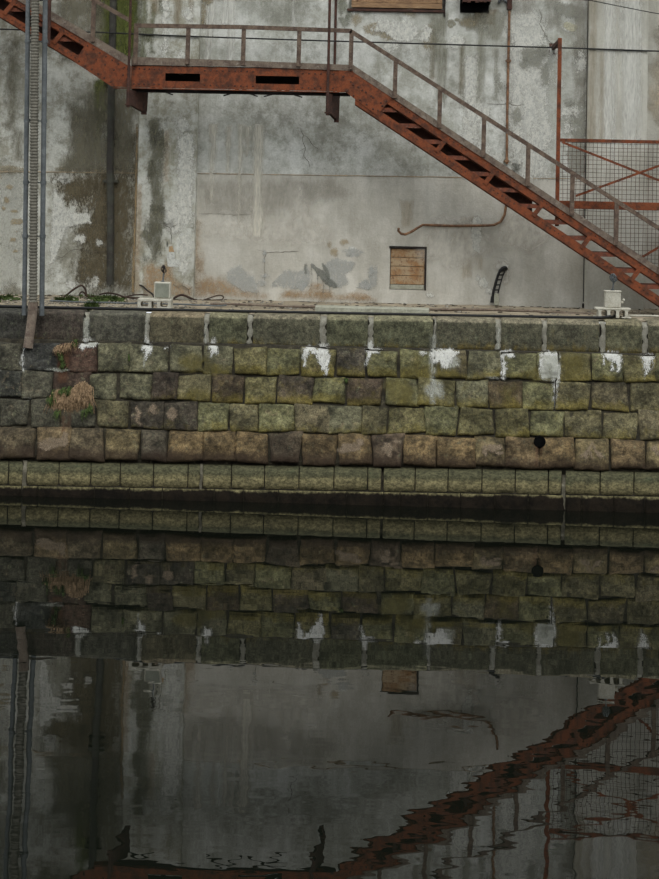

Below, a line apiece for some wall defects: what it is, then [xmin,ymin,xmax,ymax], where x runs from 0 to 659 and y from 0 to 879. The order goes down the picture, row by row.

damp [51,79,167,295]
spalling [272,246,378,293]
efflorescence [303,343,330,376]
damp [364,341,383,365]
damp [411,334,459,402]
damp [493,329,515,400]
efflorescence [538,352,561,398]
efflorescence [601,350,623,372]